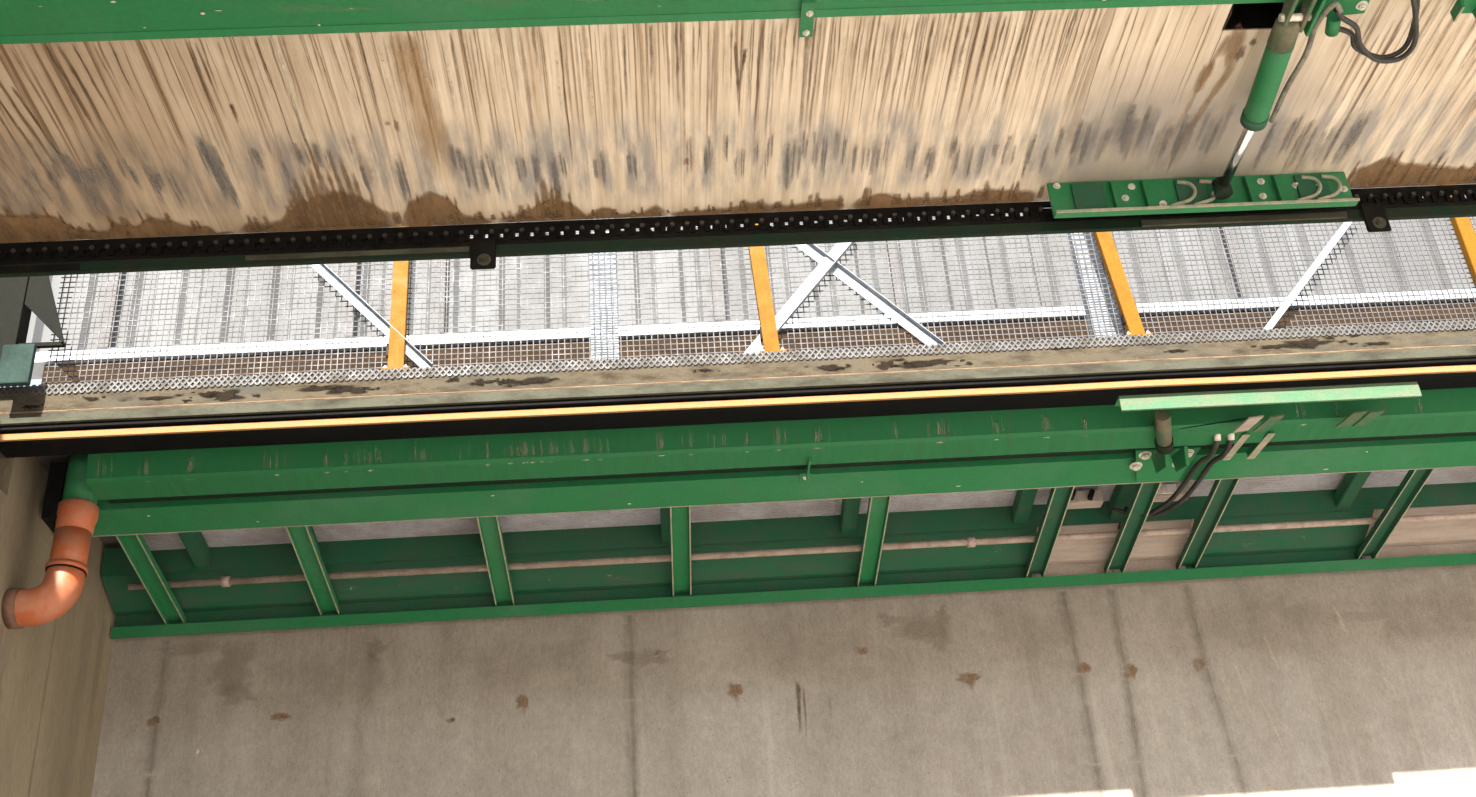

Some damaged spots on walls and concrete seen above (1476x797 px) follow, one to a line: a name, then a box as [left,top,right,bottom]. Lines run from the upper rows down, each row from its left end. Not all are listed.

damp [0,29,1044,243]
damp [650,21,764,93]